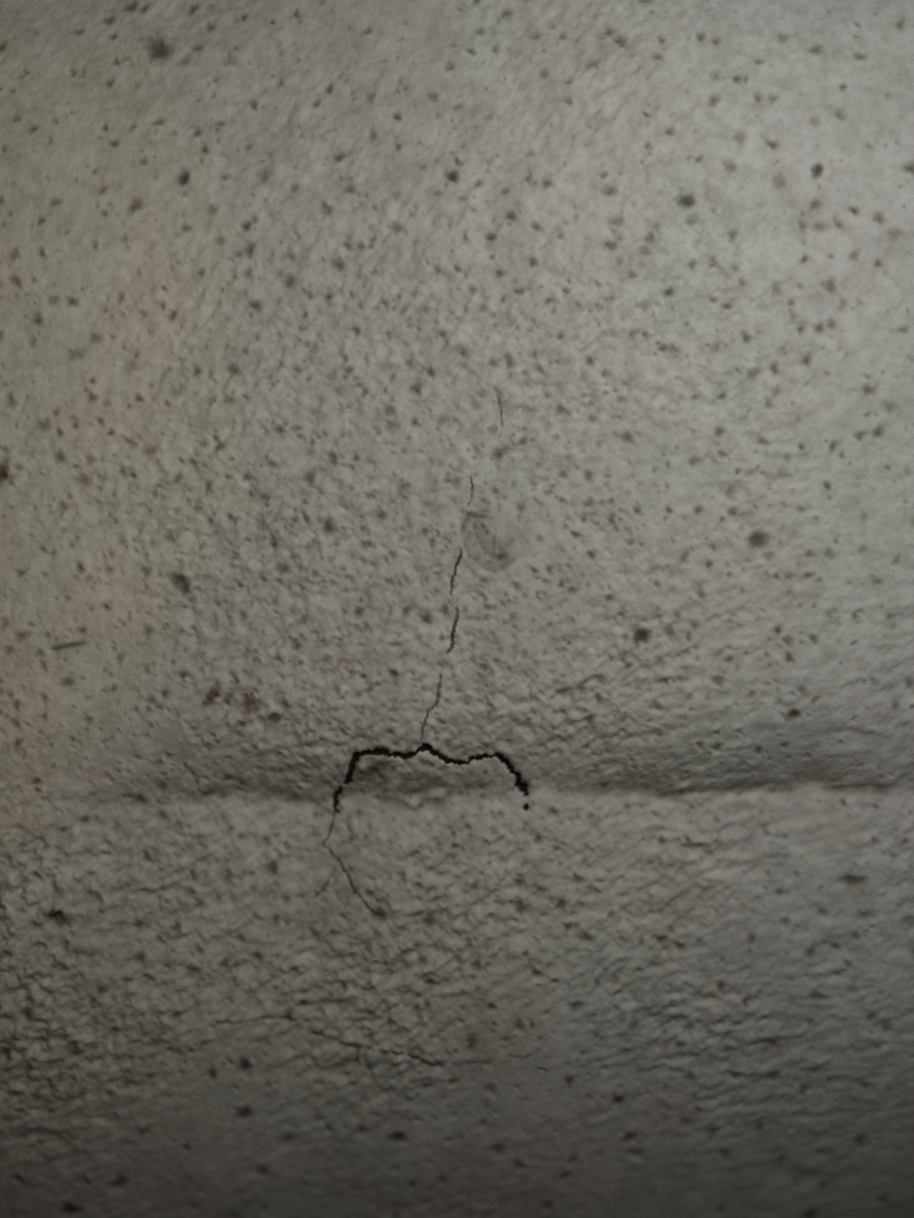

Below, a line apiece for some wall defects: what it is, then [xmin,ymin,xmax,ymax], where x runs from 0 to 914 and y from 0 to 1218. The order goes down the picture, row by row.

crack [328,551,529,915]